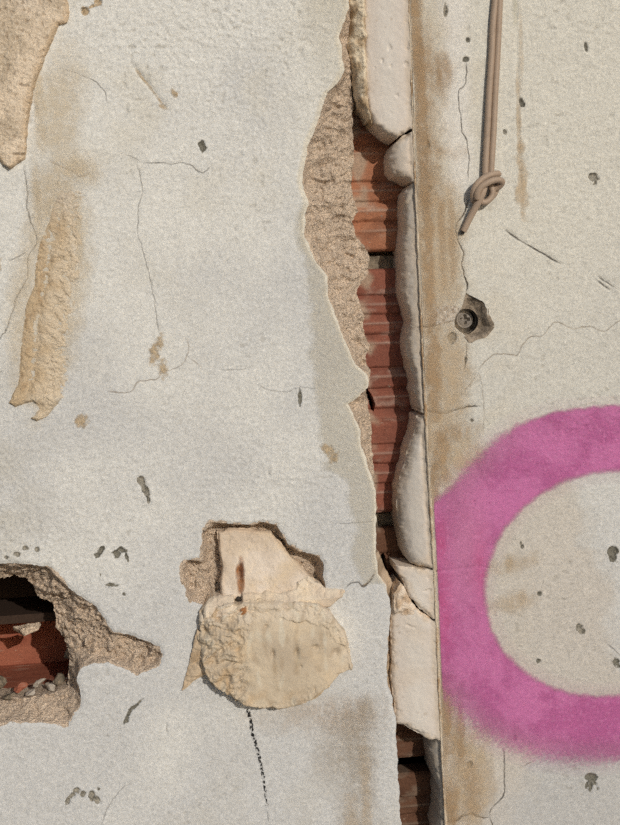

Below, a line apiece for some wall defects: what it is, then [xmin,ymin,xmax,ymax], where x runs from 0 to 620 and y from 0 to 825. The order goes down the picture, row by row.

flaking render [302,0,378,510]
damp [420,190,457,310]
flaking render [429,293,494,344]
corrosion [236,564,244,591]
flaking render [179,520,326,604]
spalling [375,549,431,619]
spalling [0,546,163,728]
flaking render [386,630,395,713]